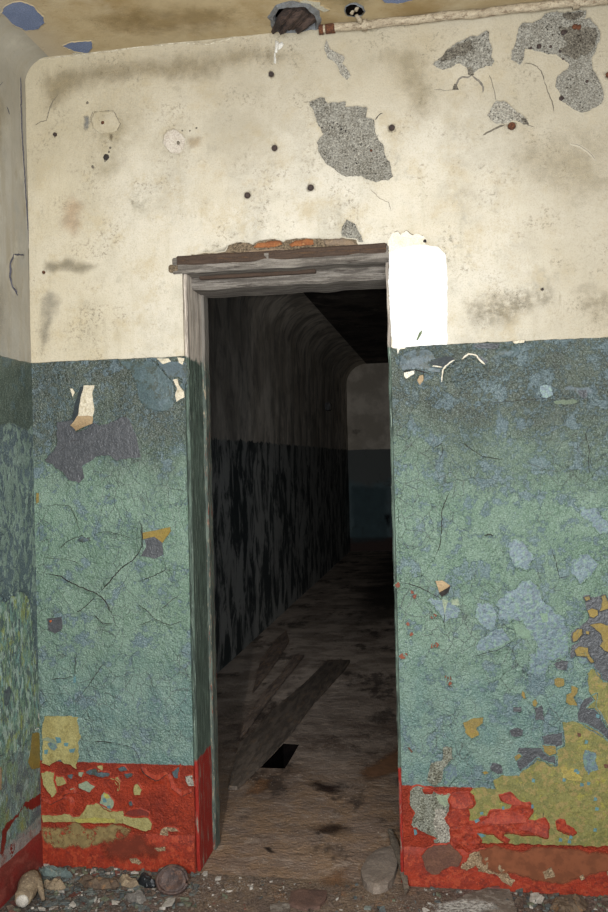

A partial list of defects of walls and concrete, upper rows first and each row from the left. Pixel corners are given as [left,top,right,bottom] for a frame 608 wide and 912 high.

peeling [0,0,46,31]
flaking render [431,29,534,135]
flaking render [510,9,605,114]
flaking render [308,96,394,184]
peeling [44,384,142,484]
crack [46,493,185,629]
peeling [394,579,462,629]
crack [51,653,105,706]
peeling [0,589,181,912]
peeling [170,764,195,787]
peeling [408,537,608,900]
peeling [529,893,546,909]